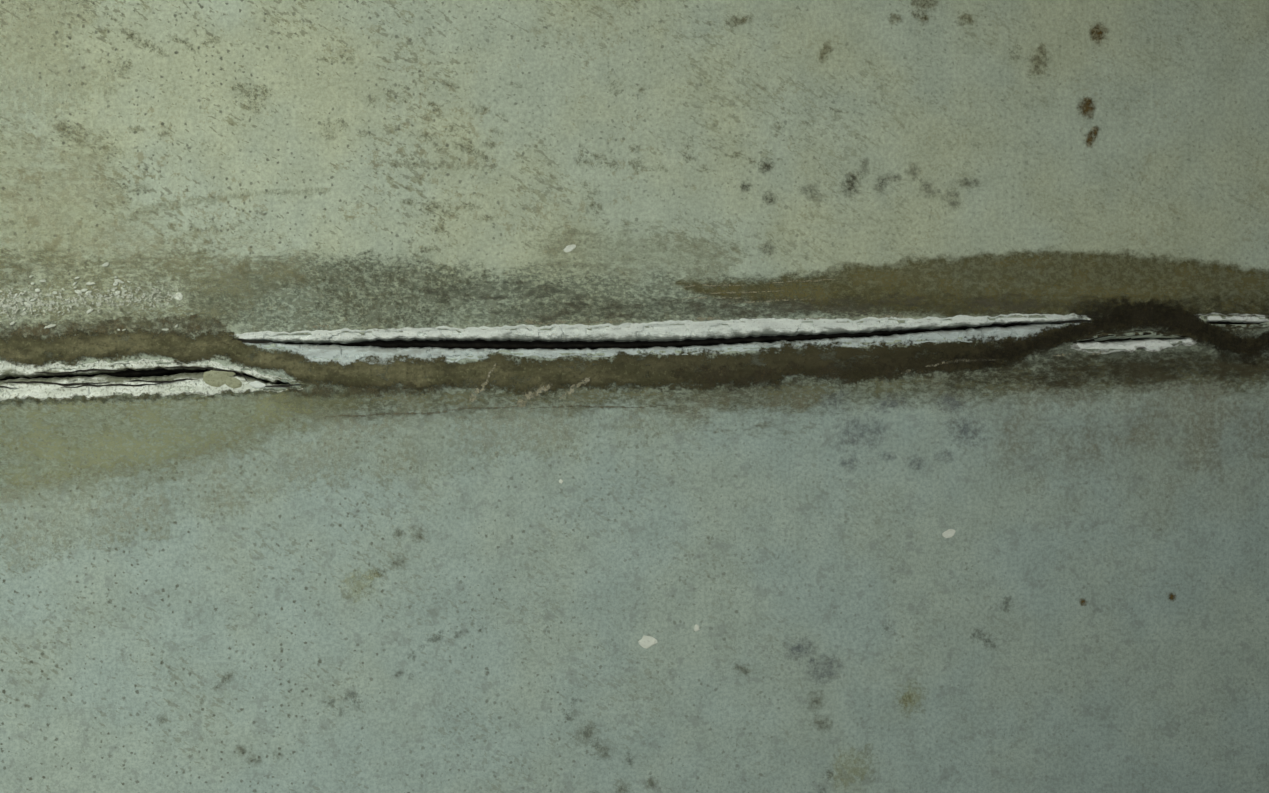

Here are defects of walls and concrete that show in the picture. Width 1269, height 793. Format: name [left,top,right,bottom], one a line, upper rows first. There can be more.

crack [0,312,1269,401]
leakage [0,249,1269,491]